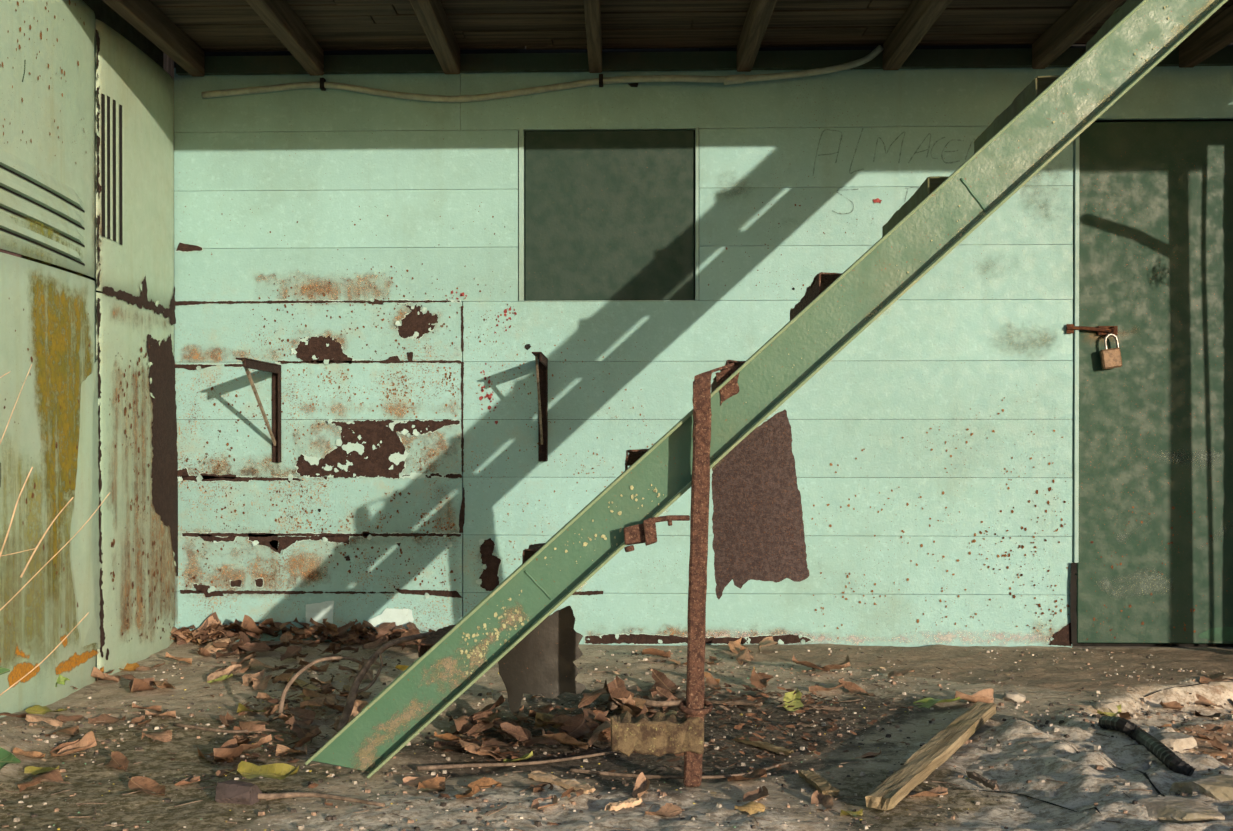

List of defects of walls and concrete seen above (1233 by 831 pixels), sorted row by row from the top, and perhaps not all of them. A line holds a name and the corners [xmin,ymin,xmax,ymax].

rust [715,366,740,405]
rust [705,410,1144,647]
rust [584,628,688,645]